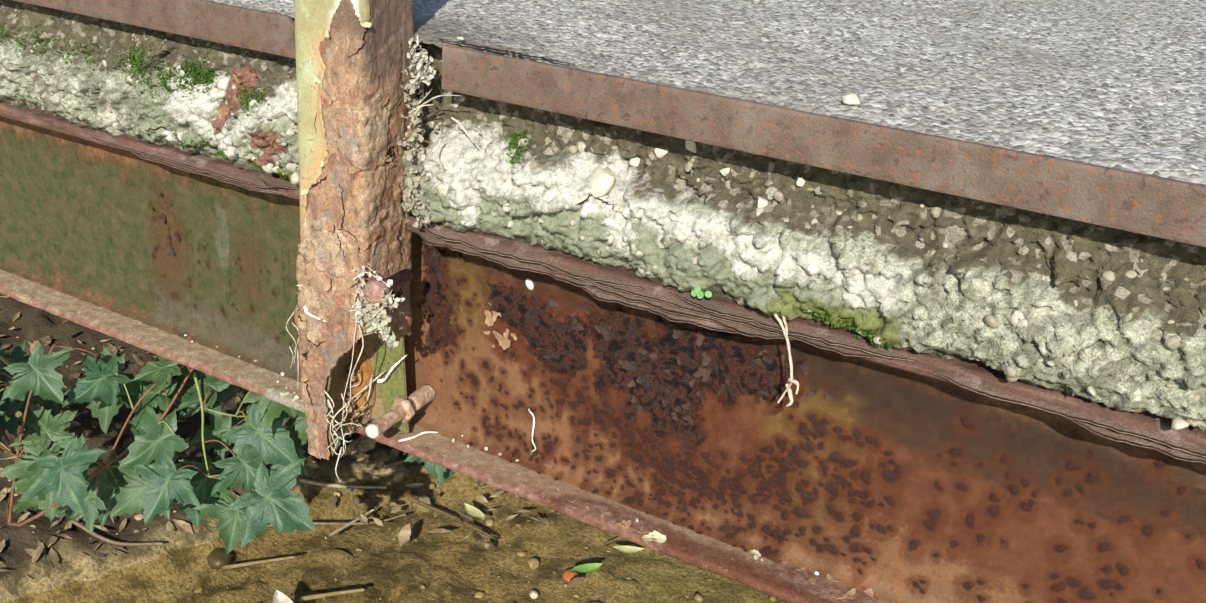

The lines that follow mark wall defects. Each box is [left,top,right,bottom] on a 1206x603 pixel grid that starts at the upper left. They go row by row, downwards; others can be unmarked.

corrosion [211,66,258,135]
spalling [0,0,1206,460]
corrosion [413,226,918,482]
corrosion [933,372,1206,464]